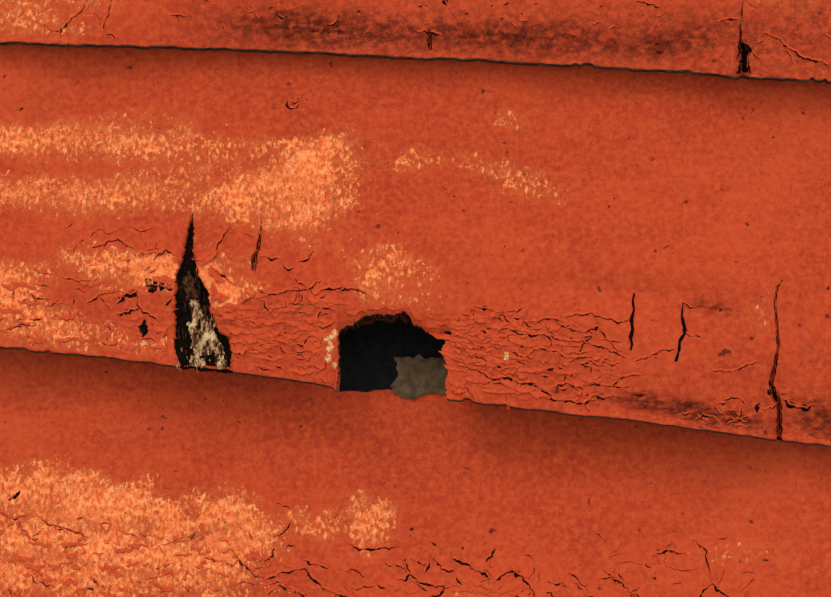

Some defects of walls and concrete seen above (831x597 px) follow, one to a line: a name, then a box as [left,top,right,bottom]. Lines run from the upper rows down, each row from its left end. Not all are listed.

crack [717,0,829,74]
peeling [0,281,41,314]
crack [0,222,368,383]
spalling [108,214,614,404]
crack [453,293,701,418]
crack [682,282,817,440]
peeling [6,520,88,597]
peeling [98,561,141,597]
peeling [113,543,149,553]